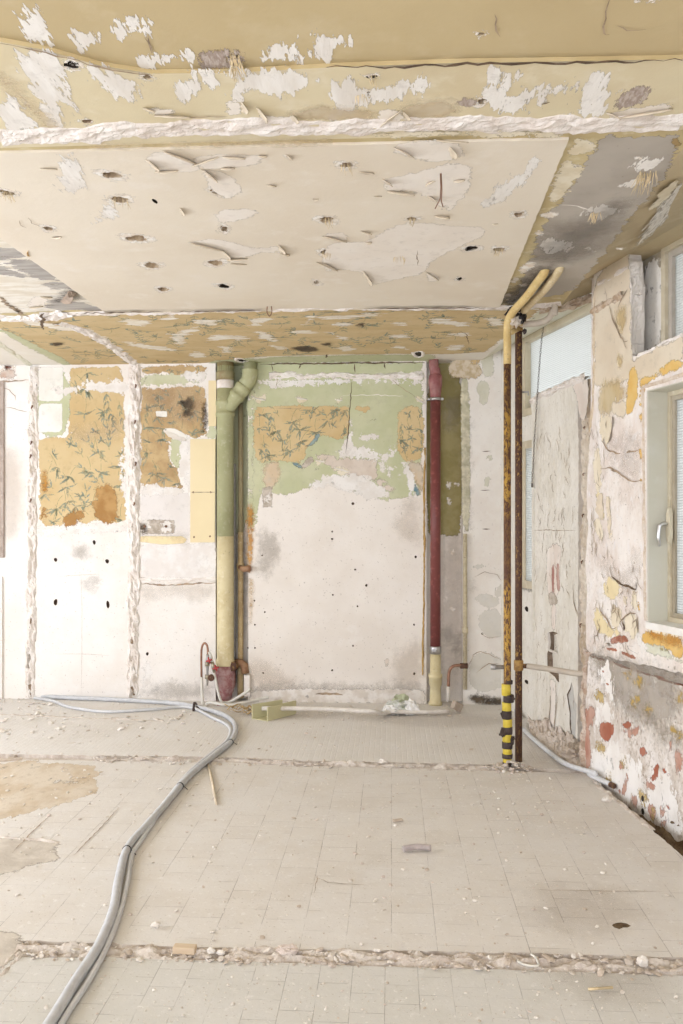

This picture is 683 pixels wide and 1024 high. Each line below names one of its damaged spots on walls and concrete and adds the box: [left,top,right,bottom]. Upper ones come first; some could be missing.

spalling [61,56,85,73]
spalling [190,48,251,83]
spalling [0,188,22,202]
peeling [0,238,95,314]
spalling [92,169,133,209]
spalling [118,233,157,244]
spalling [138,261,165,270]
peeling [145,151,290,268]
peeling [312,73,683,768]
rust [246,507,254,572]
peeling [140,351,482,675]
flaking render [618,741,683,827]